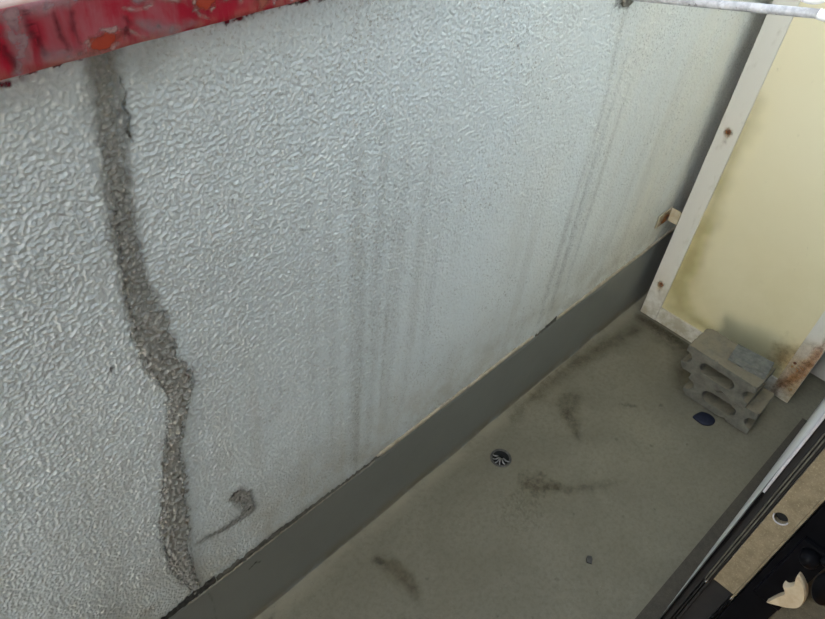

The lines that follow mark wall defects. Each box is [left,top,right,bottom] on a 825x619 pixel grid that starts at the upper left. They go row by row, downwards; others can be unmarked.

peeling [79,26,119,56]
crack [92,50,200,595]